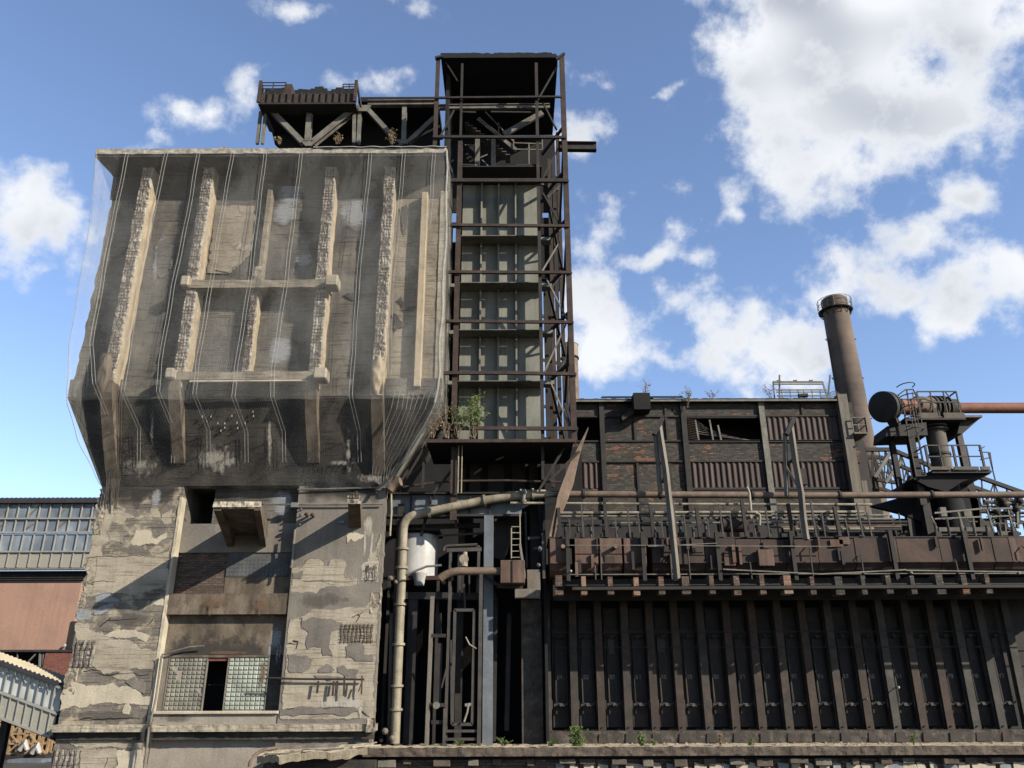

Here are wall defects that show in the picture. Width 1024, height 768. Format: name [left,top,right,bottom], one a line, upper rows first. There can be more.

peeling [59,489,172,715]
peeling [278,532,381,732]